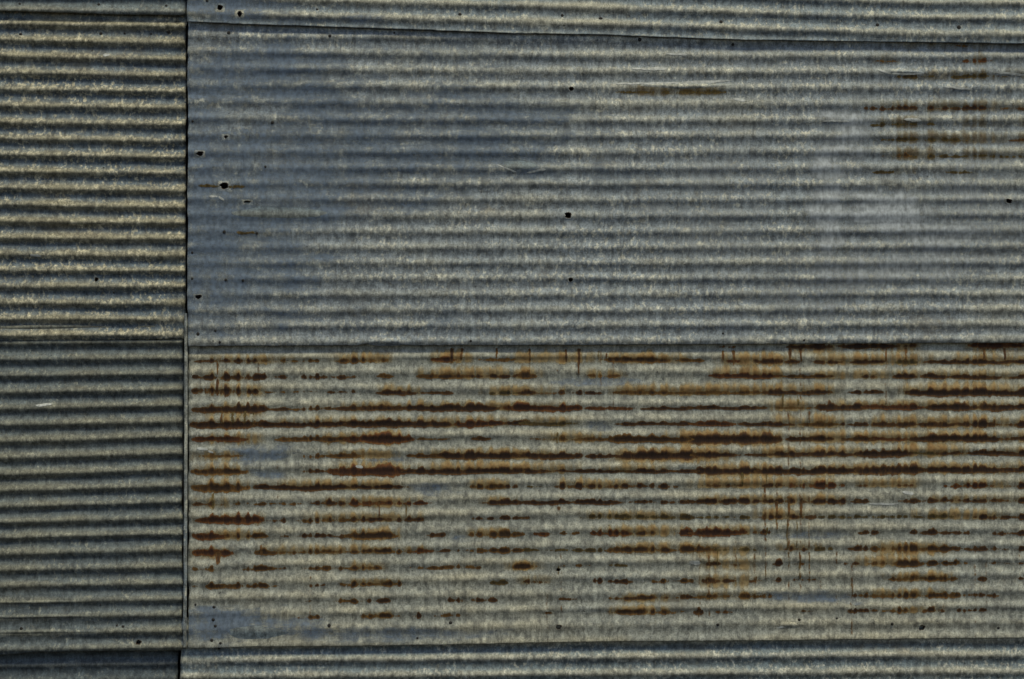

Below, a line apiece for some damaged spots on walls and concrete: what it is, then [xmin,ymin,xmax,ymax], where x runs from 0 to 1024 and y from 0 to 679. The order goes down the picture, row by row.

corrosion [189,343,1024,634]